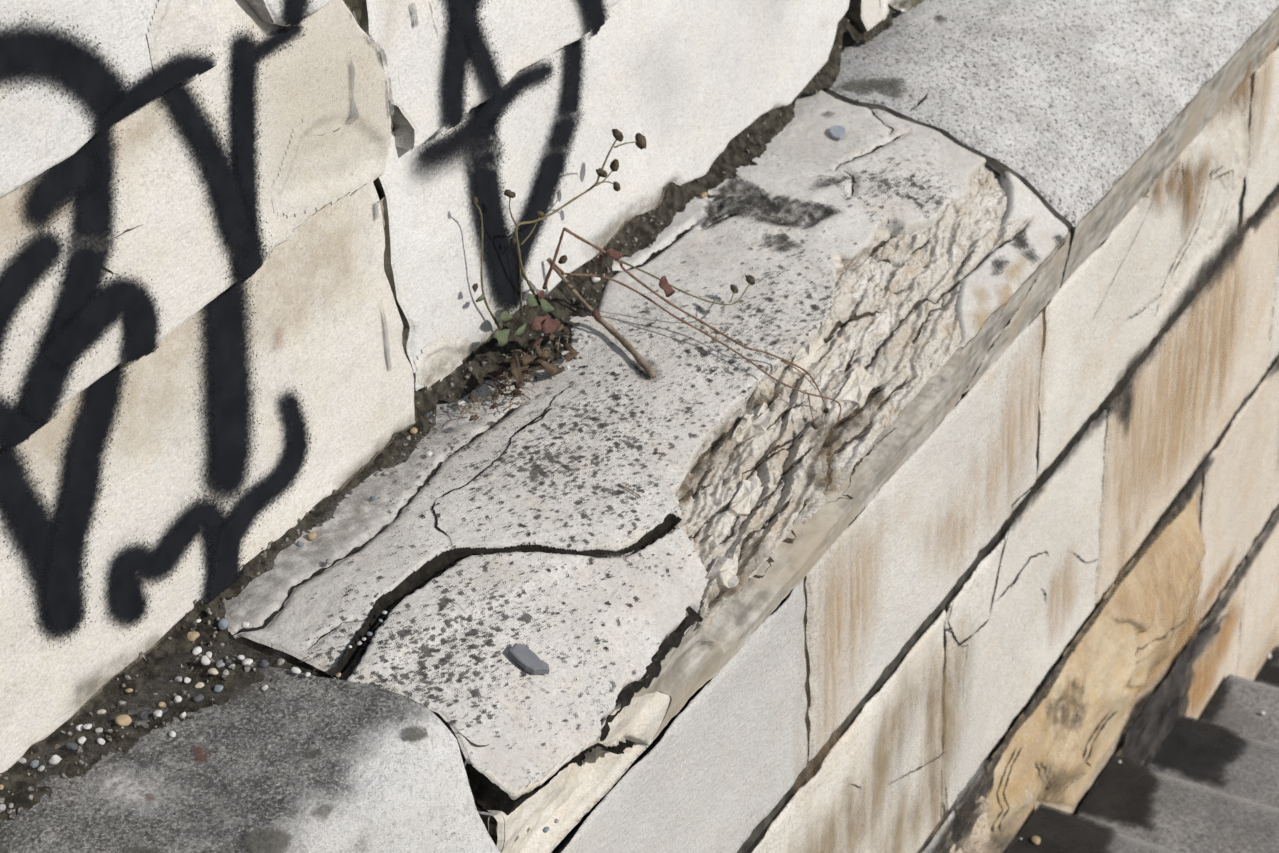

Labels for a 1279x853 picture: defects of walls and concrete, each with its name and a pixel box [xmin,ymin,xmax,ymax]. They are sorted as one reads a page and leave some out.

spalling [663,164,1031,627]
crack [964,242,1065,391]
crack [230,226,1026,853]
crack [948,479,1098,702]
crack [998,745,1050,835]